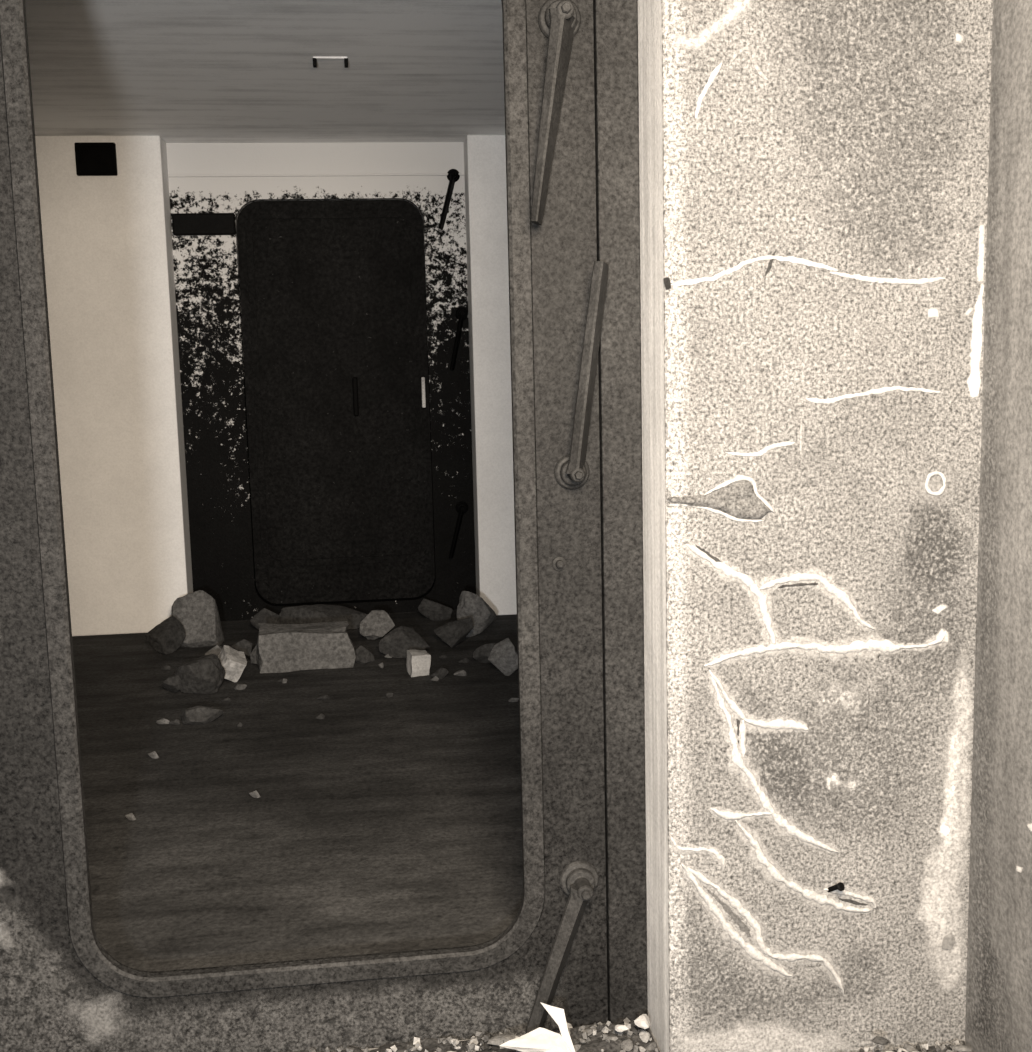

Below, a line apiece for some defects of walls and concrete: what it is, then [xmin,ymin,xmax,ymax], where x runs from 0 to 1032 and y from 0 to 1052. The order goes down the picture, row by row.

crack [663,251,946,290]
crack [725,386,943,459]
crack [669,543,949,994]